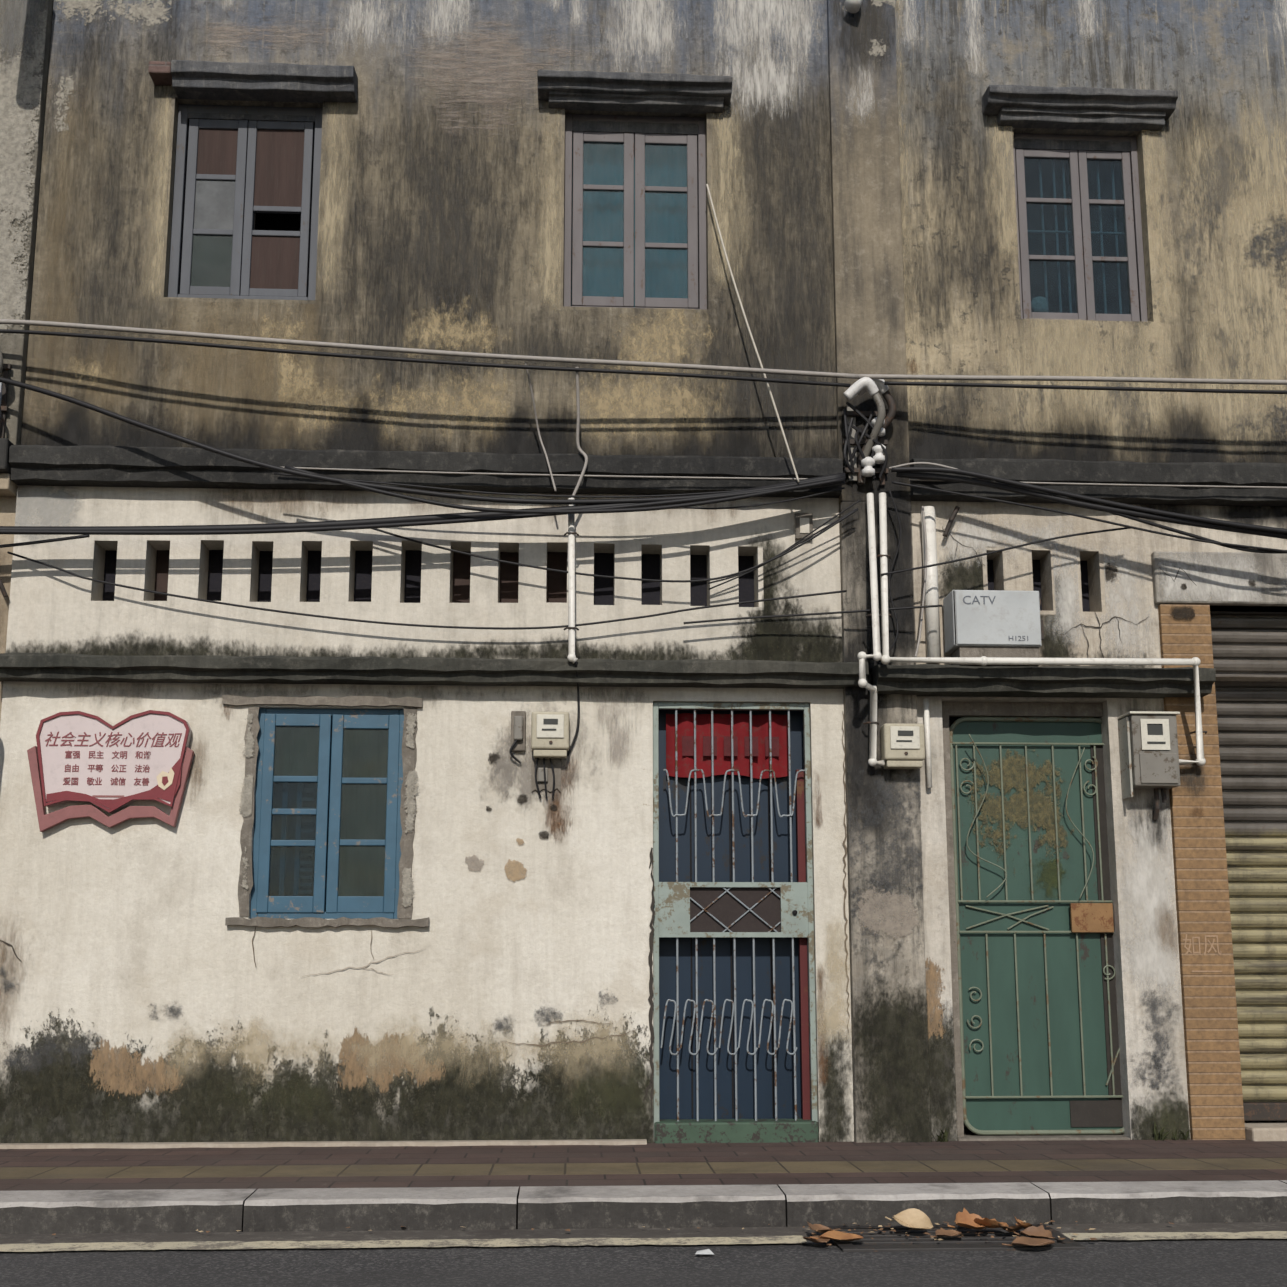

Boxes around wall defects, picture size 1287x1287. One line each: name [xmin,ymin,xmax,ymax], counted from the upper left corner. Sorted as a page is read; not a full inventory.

water stain [607,0,685,70]
water stain [714,0,818,117]
water stain [833,0,919,116]
peeling [0,0,172,338]
water stain [711,110,744,277]
water stain [682,328,836,437]
crack [1060,612,1148,658]
water stain [848,769,922,914]
crack [303,930,422,977]
peeling [88,1038,183,1099]
peeling [337,1028,446,1094]
water stain [1139,992,1174,1089]